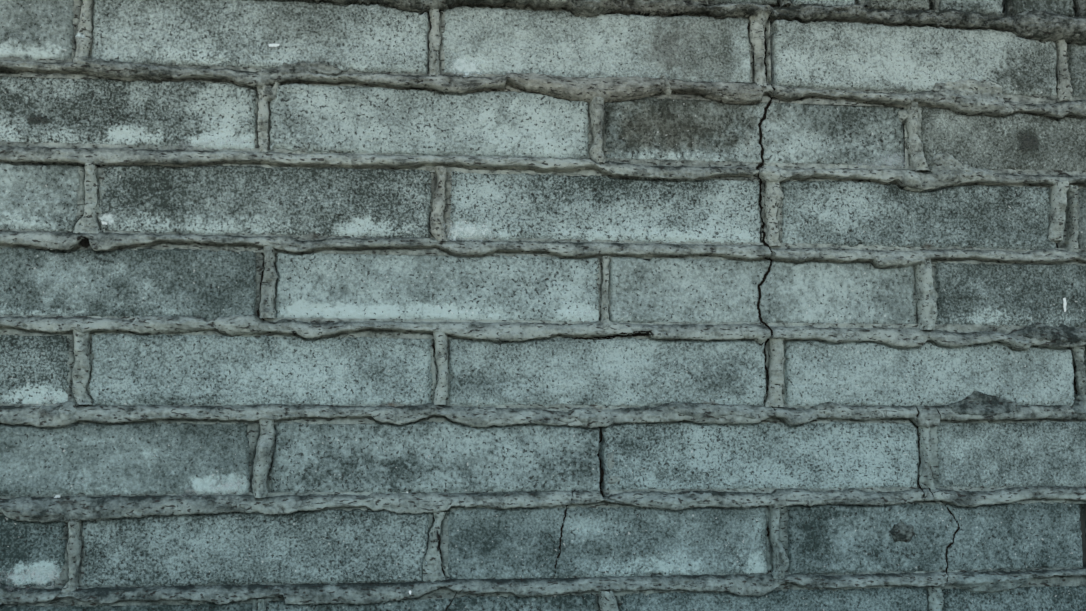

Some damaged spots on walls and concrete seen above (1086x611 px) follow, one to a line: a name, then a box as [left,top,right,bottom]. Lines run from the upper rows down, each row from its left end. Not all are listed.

crack [747,1,780,411]
crack [554,431,604,576]
crack [913,408,960,597]